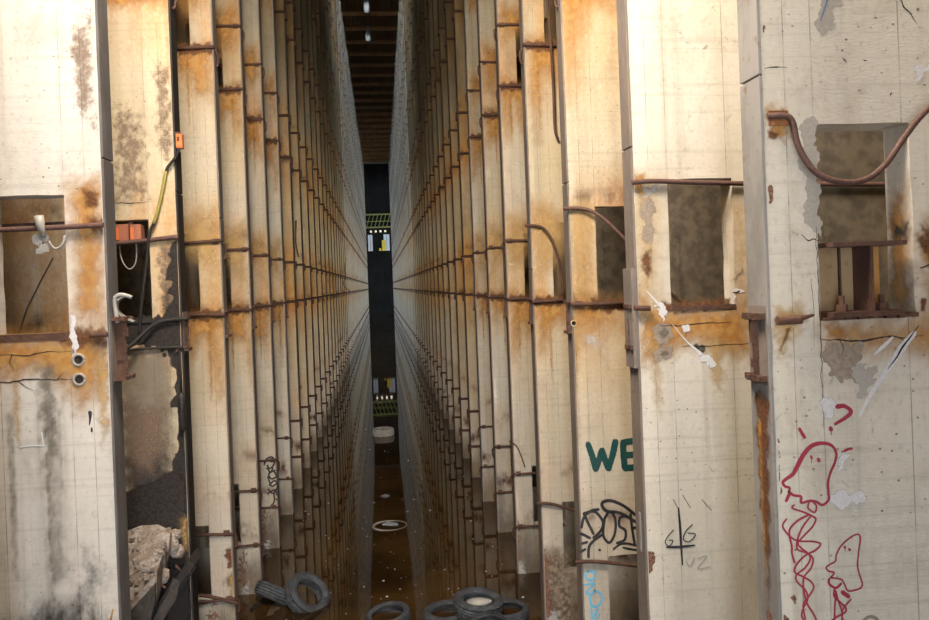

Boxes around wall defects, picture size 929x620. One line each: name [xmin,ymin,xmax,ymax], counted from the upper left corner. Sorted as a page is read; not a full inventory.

peeling [814,0,843,36]
rust [472,41,557,166]
rust [72,182,103,314]
rust [539,213,562,264]
peeling [639,186,656,246]
peeling [798,116,823,241]
rust [0,328,108,425]
rust [477,292,566,337]
rust [580,298,624,321]
rust [641,297,750,379]
peeling [821,338,878,399]
rust [755,391,771,563]